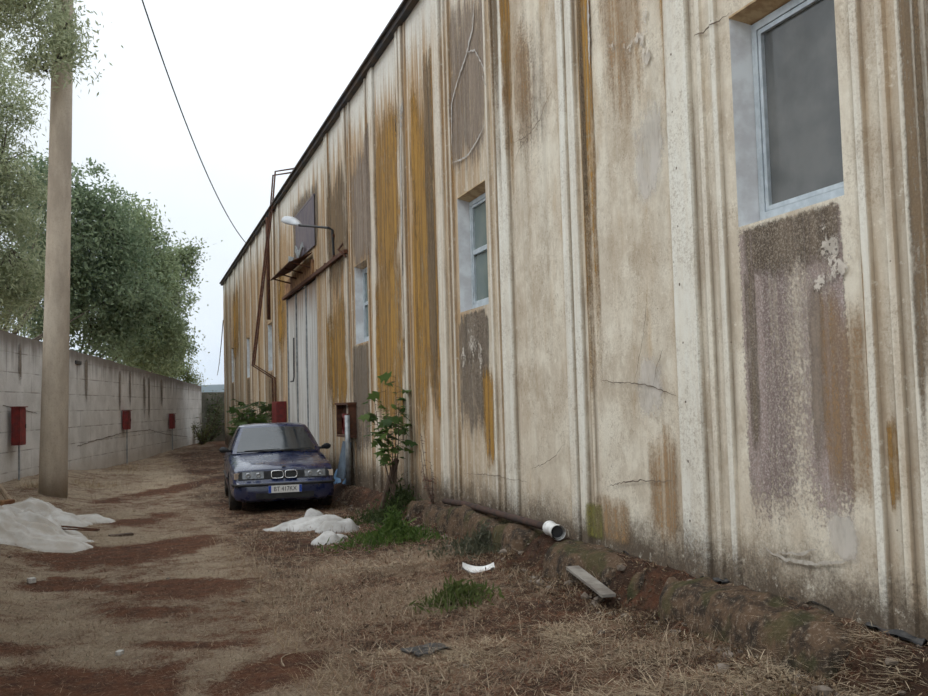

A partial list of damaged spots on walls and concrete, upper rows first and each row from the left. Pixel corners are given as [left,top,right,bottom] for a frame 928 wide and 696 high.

rust [375,49,441,439]
damp [459,309,489,434]
rust [483,370,494,464]
crack [602,304,676,396]
damp [738,202,855,529]
crack [608,479,669,487]